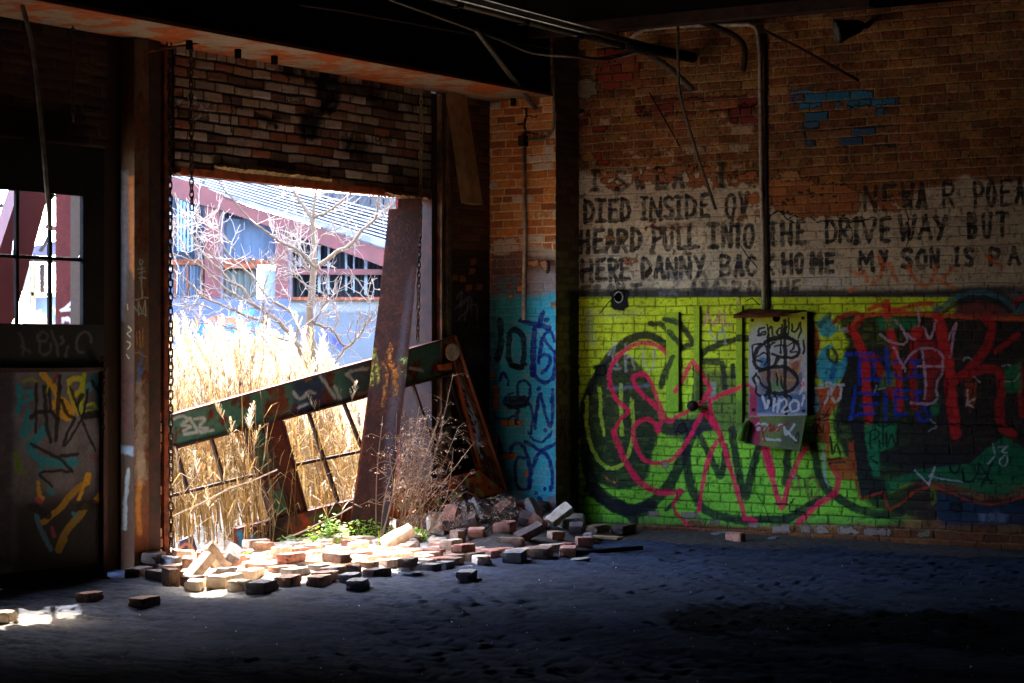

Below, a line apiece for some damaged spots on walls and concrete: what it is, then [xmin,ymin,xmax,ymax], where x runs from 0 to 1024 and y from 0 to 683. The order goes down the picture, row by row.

peeling [599,161,914,222]